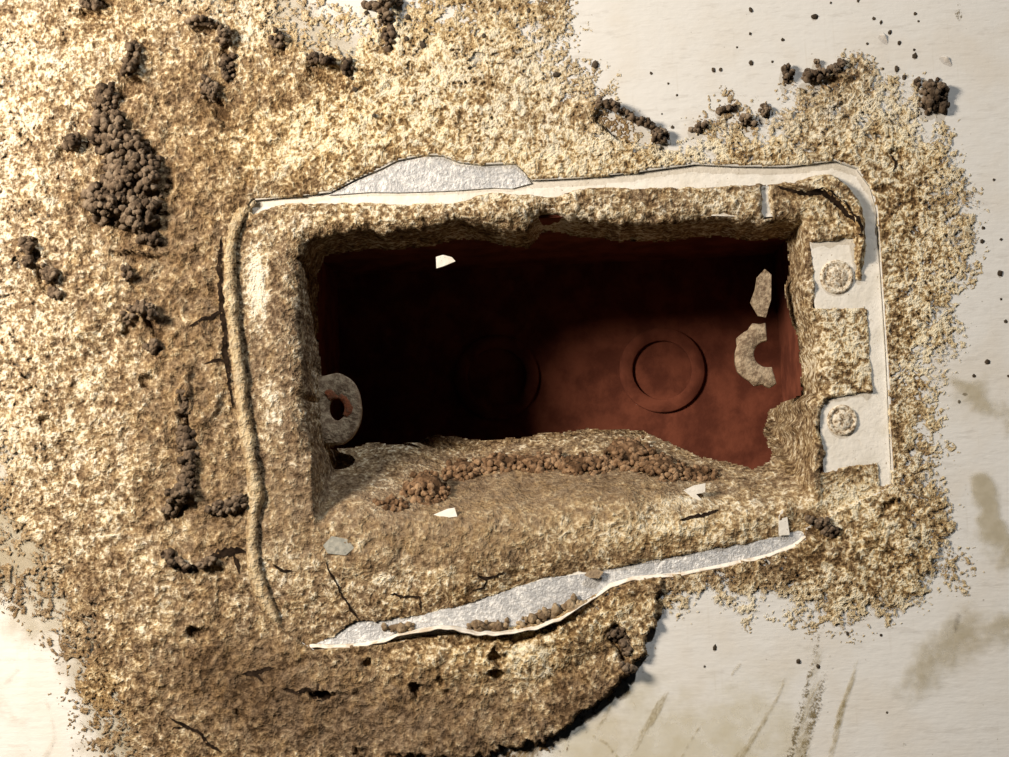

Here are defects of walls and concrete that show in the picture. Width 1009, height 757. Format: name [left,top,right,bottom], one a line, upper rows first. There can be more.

peeling [436,255,456,269]
peeling [309,510,806,649]